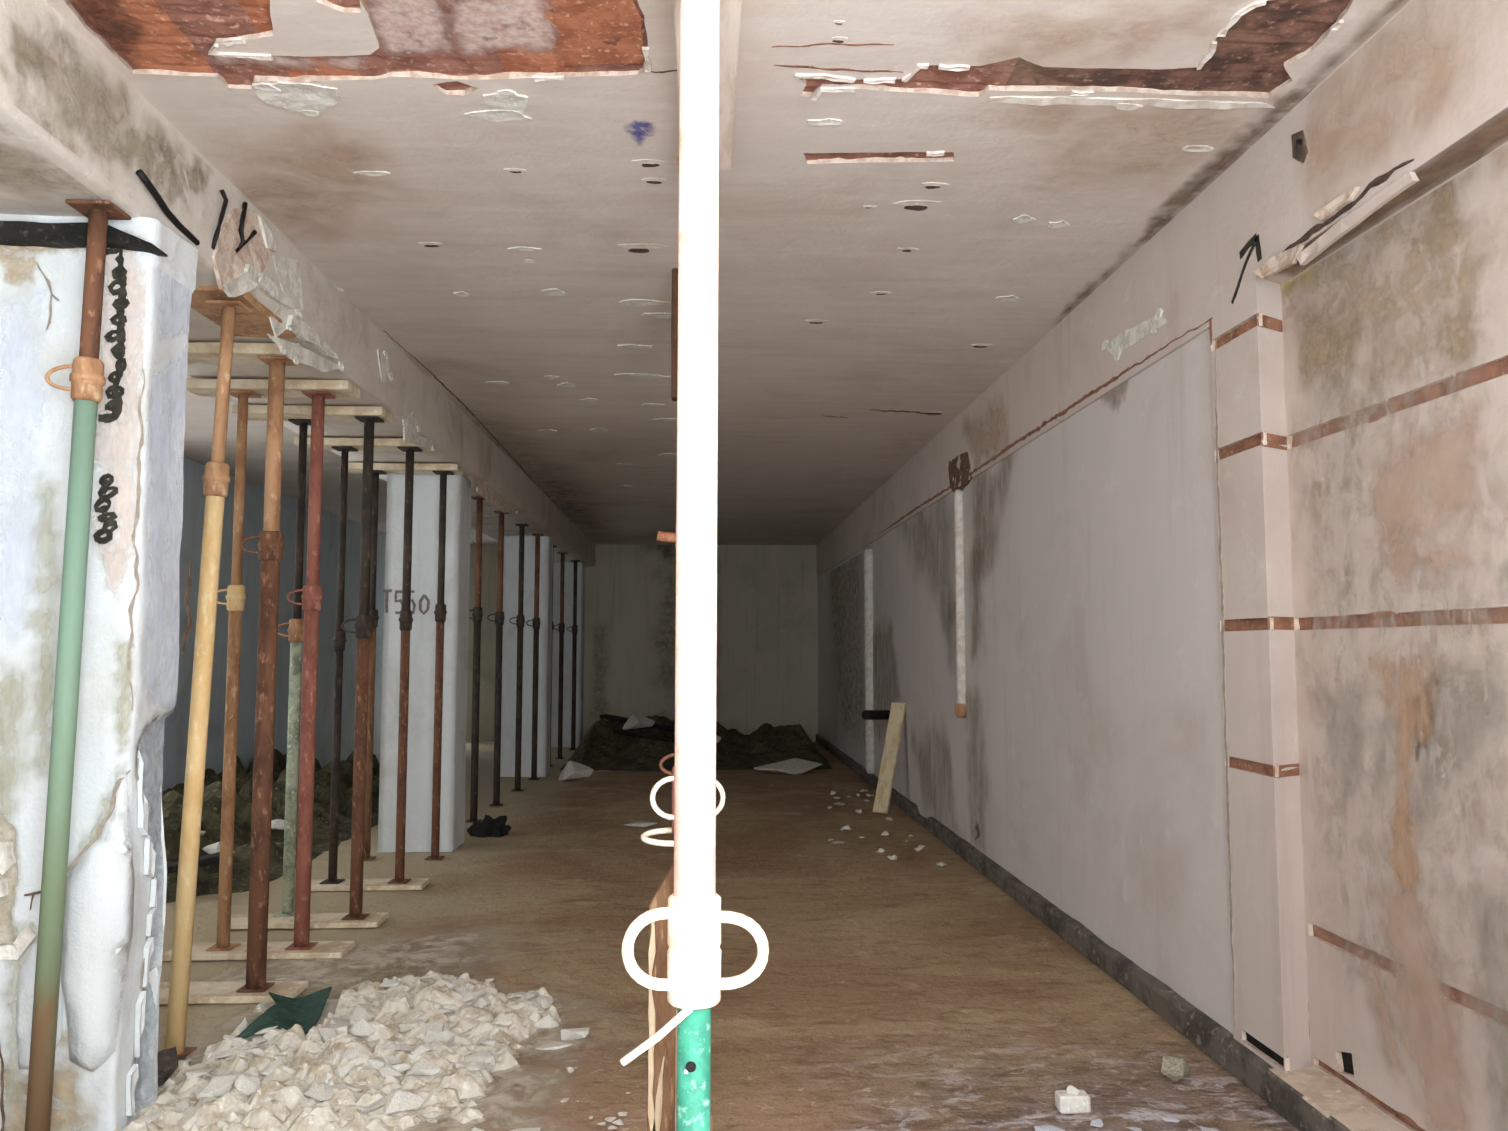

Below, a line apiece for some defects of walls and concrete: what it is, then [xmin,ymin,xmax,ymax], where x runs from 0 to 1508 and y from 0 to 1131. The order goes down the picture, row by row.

water stain [15,29,204,200]
flaking render [69,0,652,122]
flaking render [807,118,843,126]
flaking render [794,0,1350,111]
water stain [0,245,55,283]
water stain [0,489,56,813]
flaking render [126,713,171,1117]
water stain [3,959,28,1131]
water stain [50,1073,86,1131]